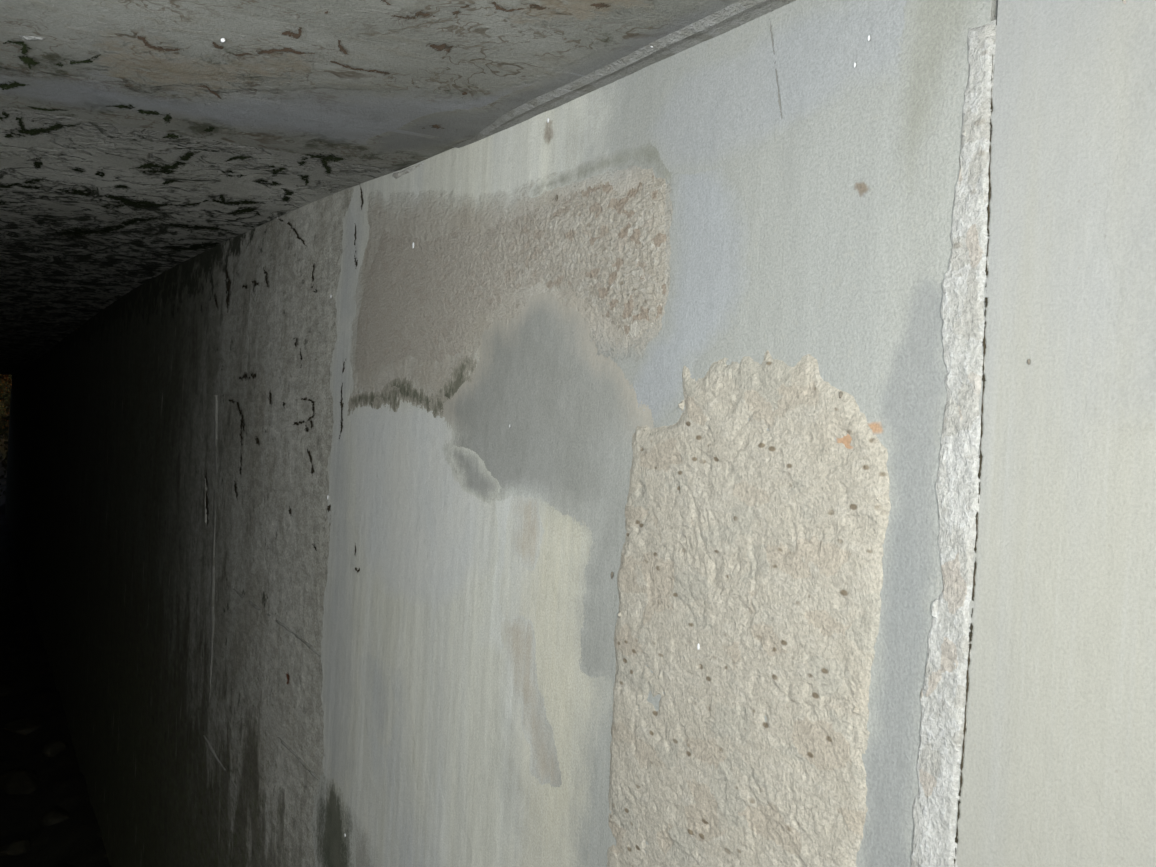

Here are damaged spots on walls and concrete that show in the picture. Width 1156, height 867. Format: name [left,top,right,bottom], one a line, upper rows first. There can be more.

crack [135,33,184,53]
crack [0,40,346,252]
crack [212,11,389,75]
crack [354,187,364,267]
crack [380,0,550,52]
spalling [355,175,668,370]
crack [770,23,782,119]
water stain [348,142,673,867]
spalling [911,20,997,867]
spalling [607,350,891,867]